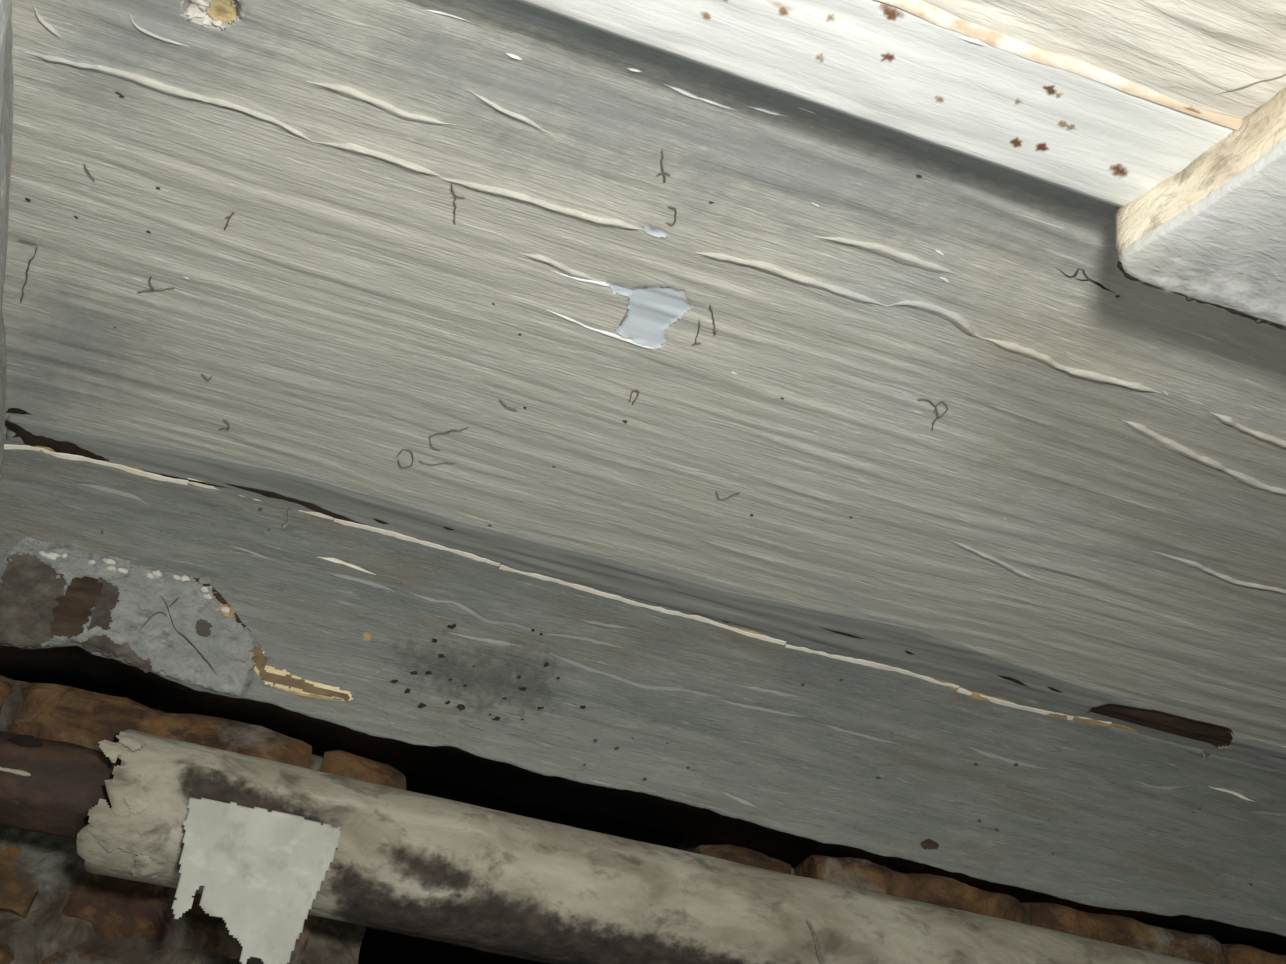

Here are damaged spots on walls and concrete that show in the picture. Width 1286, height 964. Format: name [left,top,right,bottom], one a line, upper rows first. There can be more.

flaking render [186,0,239,30]
peeling [547,270,692,350]
crack [695,236,1161,395]
flaking render [0,536,353,701]
crack [4,408,1286,816]
peeling [98,731,146,786]
peeling [88,799,120,829]
peeling [131,854,169,881]